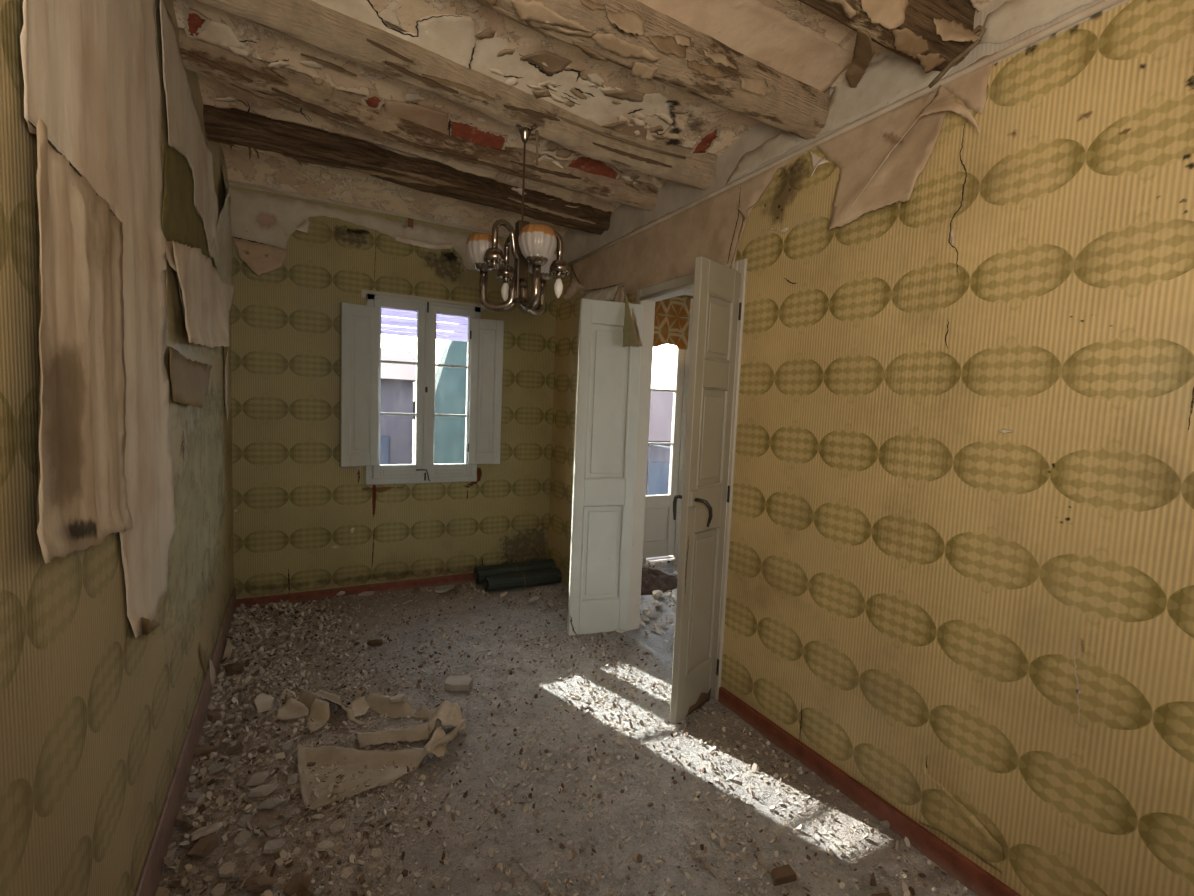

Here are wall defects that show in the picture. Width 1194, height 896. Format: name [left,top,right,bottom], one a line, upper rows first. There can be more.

peeling [182,9,257,63]
peeling [311,0,982,150]
flaking render [527,133,662,185]
flaking render [690,125,721,156]
water stain [765,164,806,233]
crack [948,124,967,273]